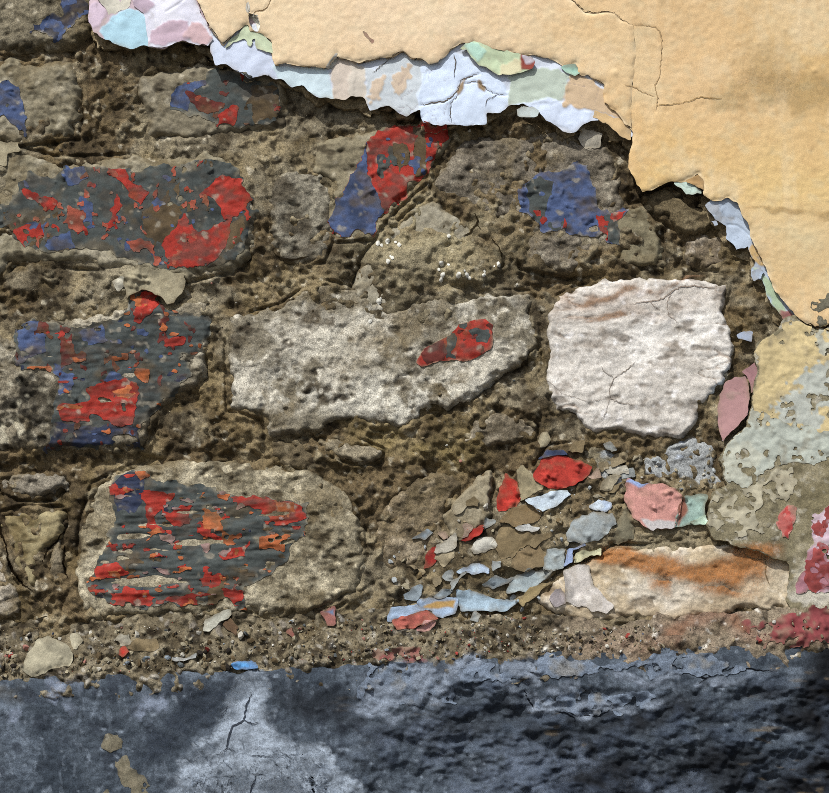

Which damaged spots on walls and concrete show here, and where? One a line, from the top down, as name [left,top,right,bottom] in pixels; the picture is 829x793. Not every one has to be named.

peeling [0,80,27,167]
spalling [30,0,633,245]
crack [423,57,503,118]
crack [574,1,722,107]
peeling [0,159,259,454]
peeling [387,175,829,632]
peeling [86,470,309,636]
peeling [231,661,258,670]
peeling [320,606,336,626]
peeling [740,605,829,649]
spalling [101,733,150,793]
crack [221,694,295,793]